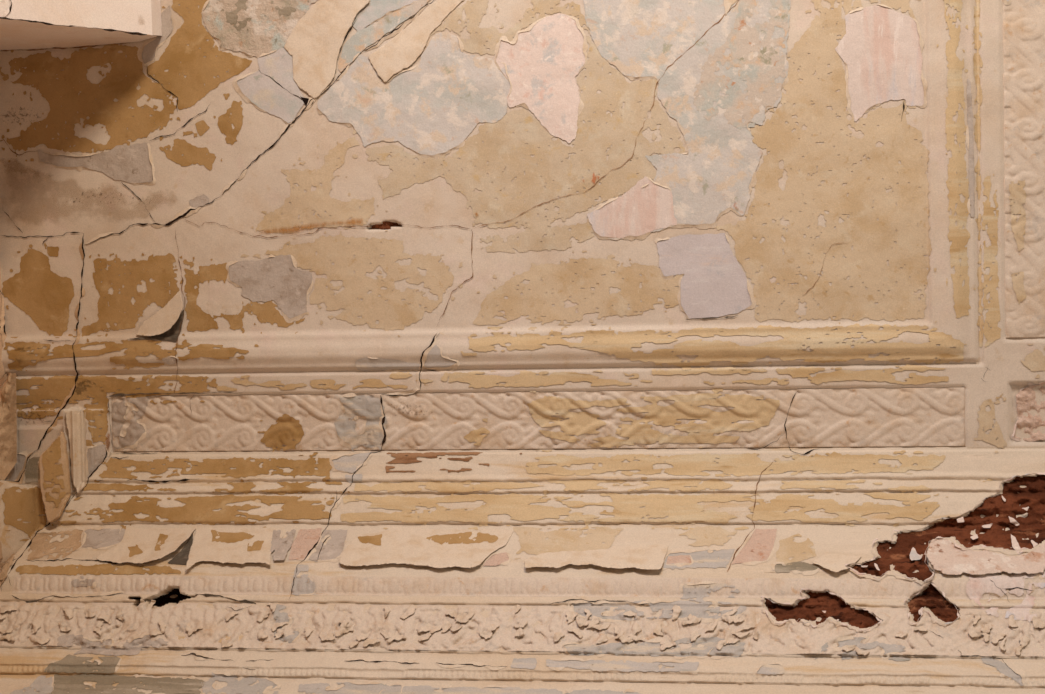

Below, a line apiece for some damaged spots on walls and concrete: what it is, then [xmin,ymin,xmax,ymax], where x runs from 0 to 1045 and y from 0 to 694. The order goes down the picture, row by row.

peeling [0,0,967,385]
crack [0,0,434,603]
crack [289,0,739,599]
peeling [355,345,652,393]
peeling [0,373,1045,624]
crack [727,392,815,572]
peeling [10,633,282,694]
crack [181,650,269,670]
crack [199,594,256,611]
crack [546,596,651,607]
peeling [511,637,745,675]
flaking render [760,588,910,661]